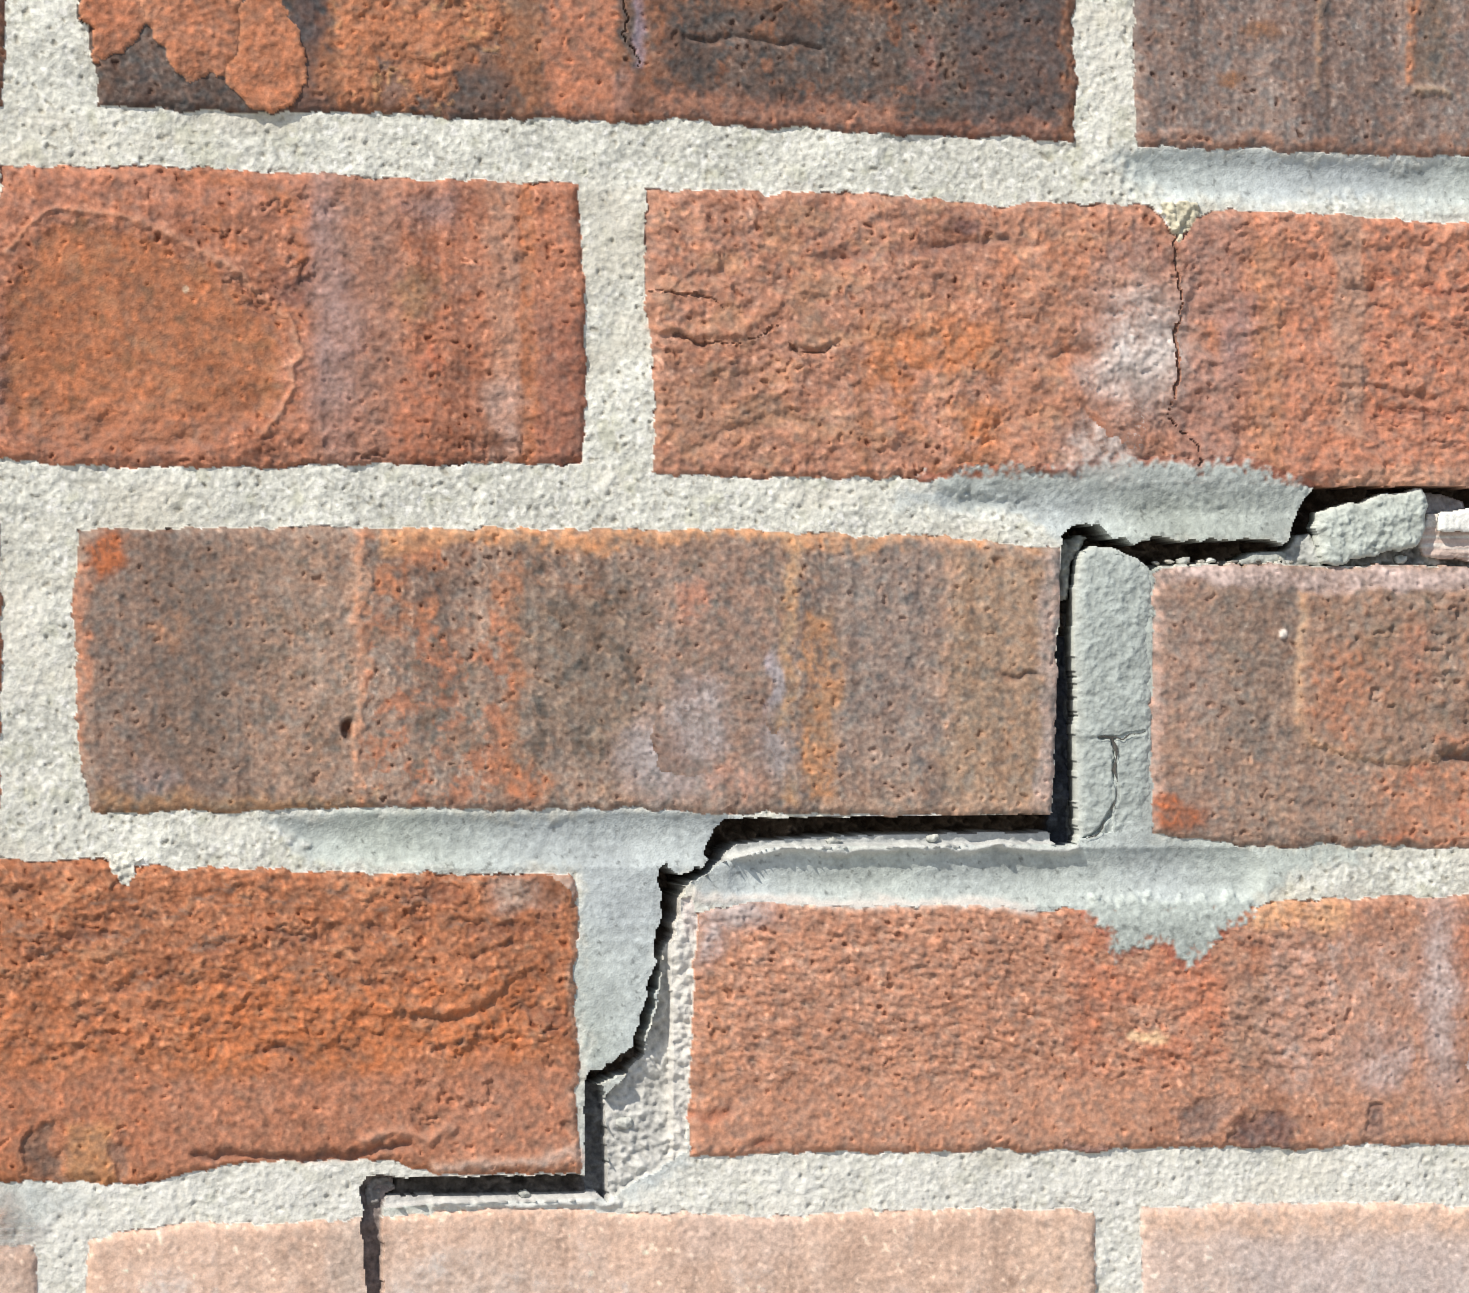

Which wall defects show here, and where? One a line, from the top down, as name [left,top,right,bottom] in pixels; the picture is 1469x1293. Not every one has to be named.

peeling [78,0,309,115]
peeling [324,0,516,120]
crack [1166,233,1204,467]
crack [1061,485,1469,571]
crack [359,600,1145,1293]